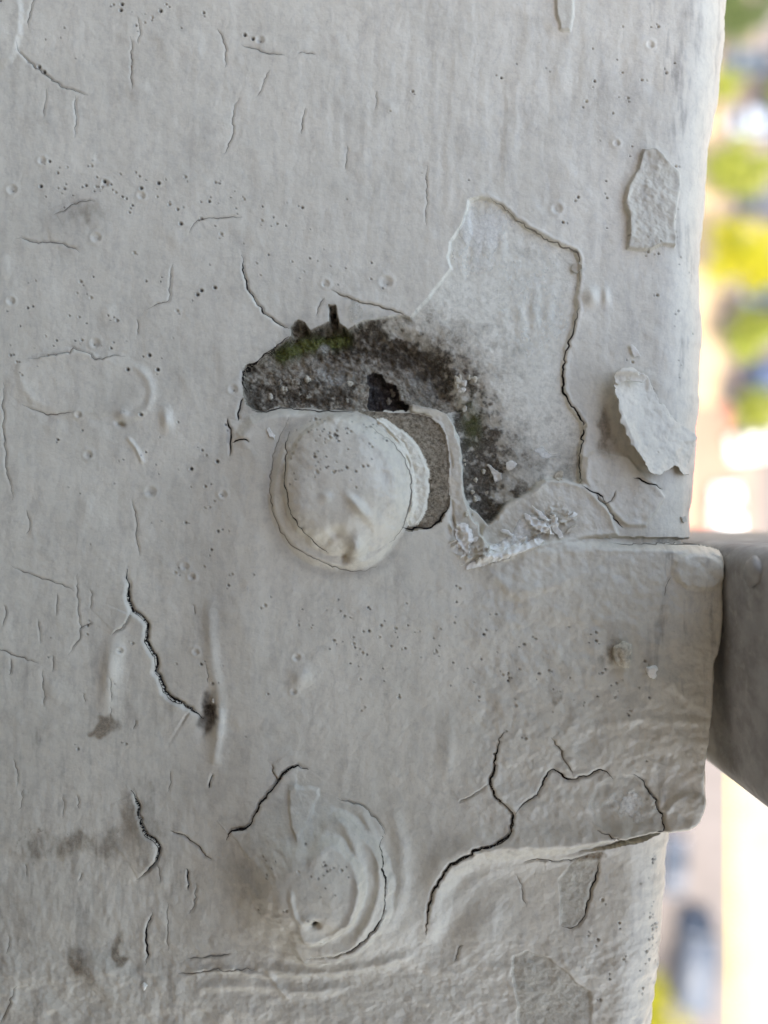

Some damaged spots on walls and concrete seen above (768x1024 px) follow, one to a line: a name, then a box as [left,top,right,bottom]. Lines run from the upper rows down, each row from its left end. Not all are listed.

leakage [460,210,514,270]
crack [490,197,580,281]
peeling [624,148,680,252]
leakage [244,366,358,411]
leakage [274,304,553,522]
peeling [243,195,697,552]
crack [1,502,204,719]
crack [133,765,309,974]
crack [426,734,609,931]
crack [602,776,665,841]